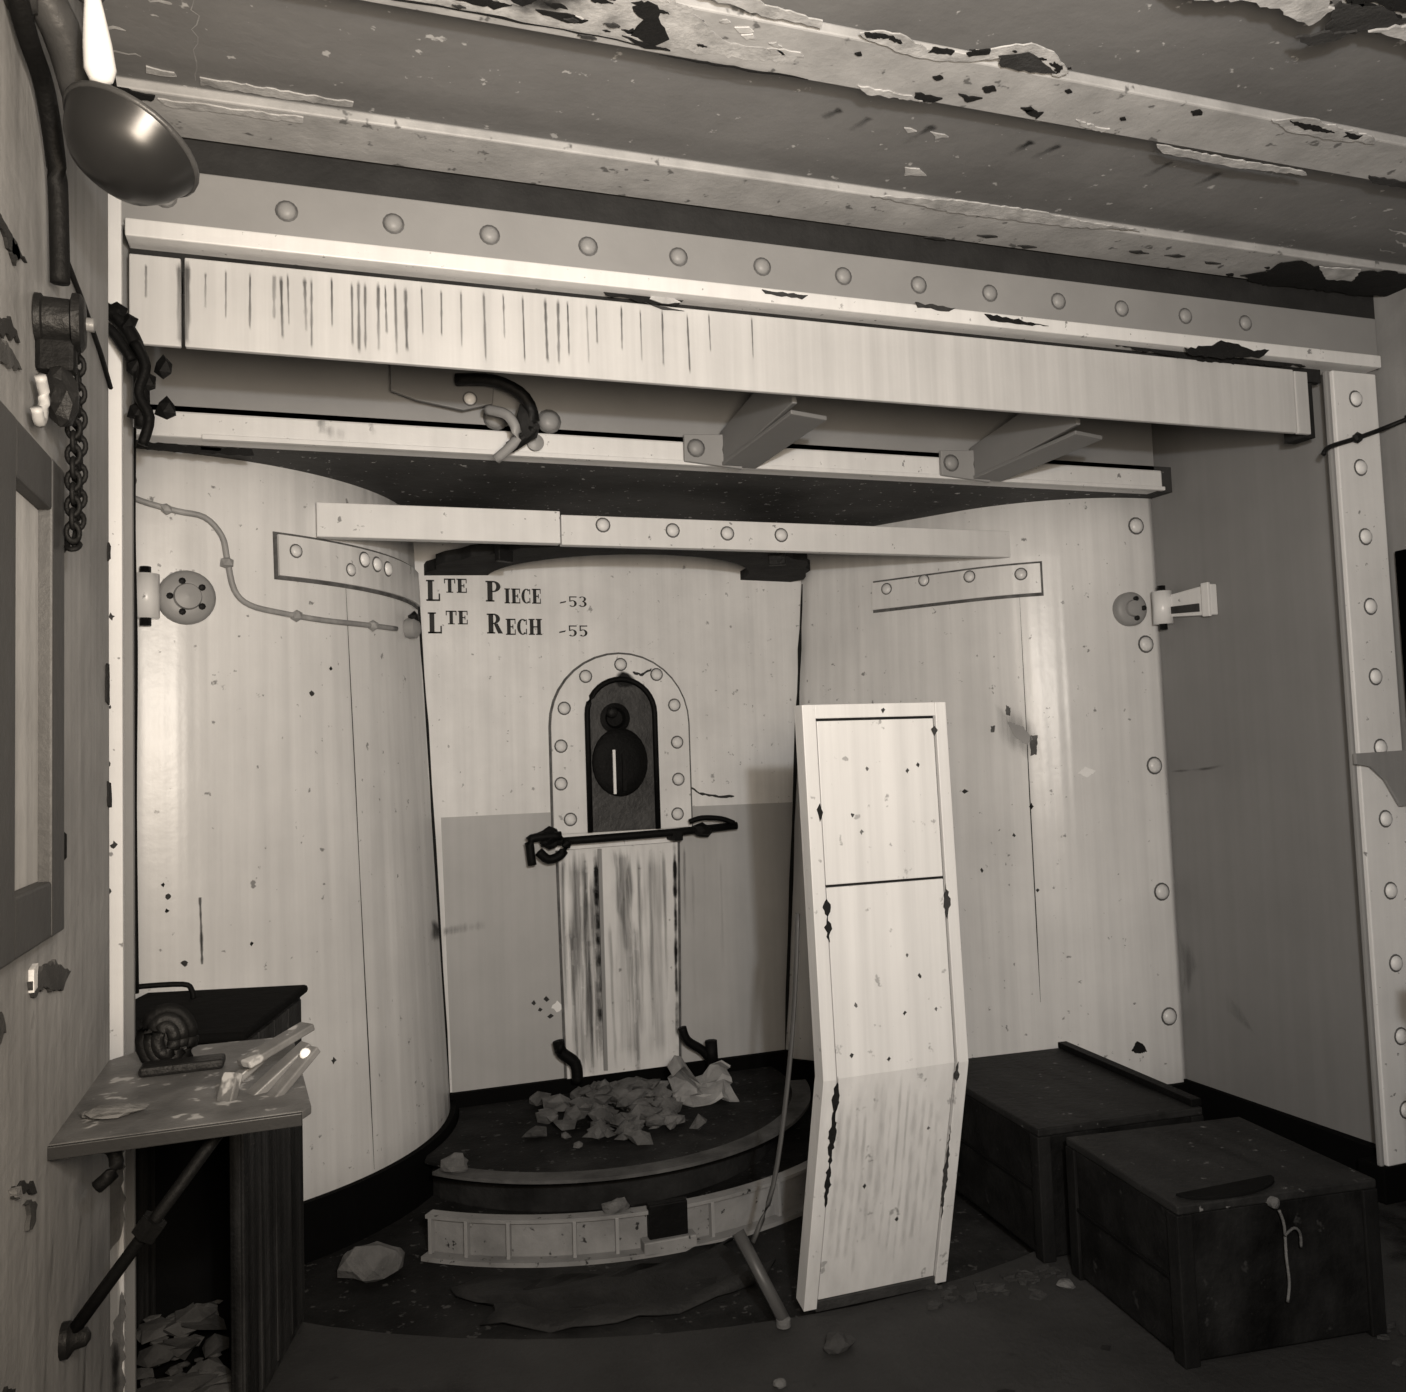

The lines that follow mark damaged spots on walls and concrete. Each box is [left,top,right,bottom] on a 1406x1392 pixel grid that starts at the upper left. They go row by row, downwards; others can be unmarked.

peeling [411,0,823,65]
spalling [1194,0,1406,46]
peeling [854,30,1072,103]
peeling [1020,106,1044,119]
peeling [1272,117,1375,144]
peeling [1157,144,1307,176]
peeling [871,195,1141,238]
peeling [0,214,27,266]
spalling [1205,260,1406,297]
peeling [0,316,22,371]
rust [585,863,602,1021]
peeling [27,959,71,998]